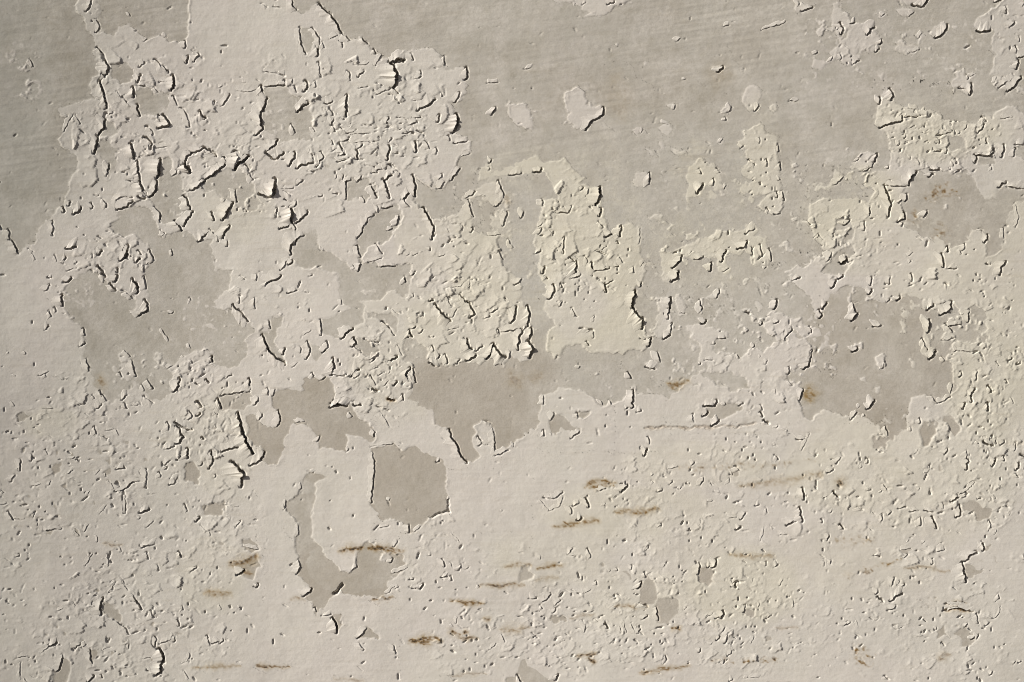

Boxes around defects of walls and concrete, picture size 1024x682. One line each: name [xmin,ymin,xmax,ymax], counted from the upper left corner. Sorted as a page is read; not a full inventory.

peeling [0,0,703,552]
peeling [797,87,1024,682]
crack [237,412,257,456]
peeling [395,221,960,682]
rust [583,475,621,493]
peeling [282,423,449,616]
rust [550,503,665,533]
rust [335,539,409,560]
rust [499,558,568,586]
rust [405,625,480,651]